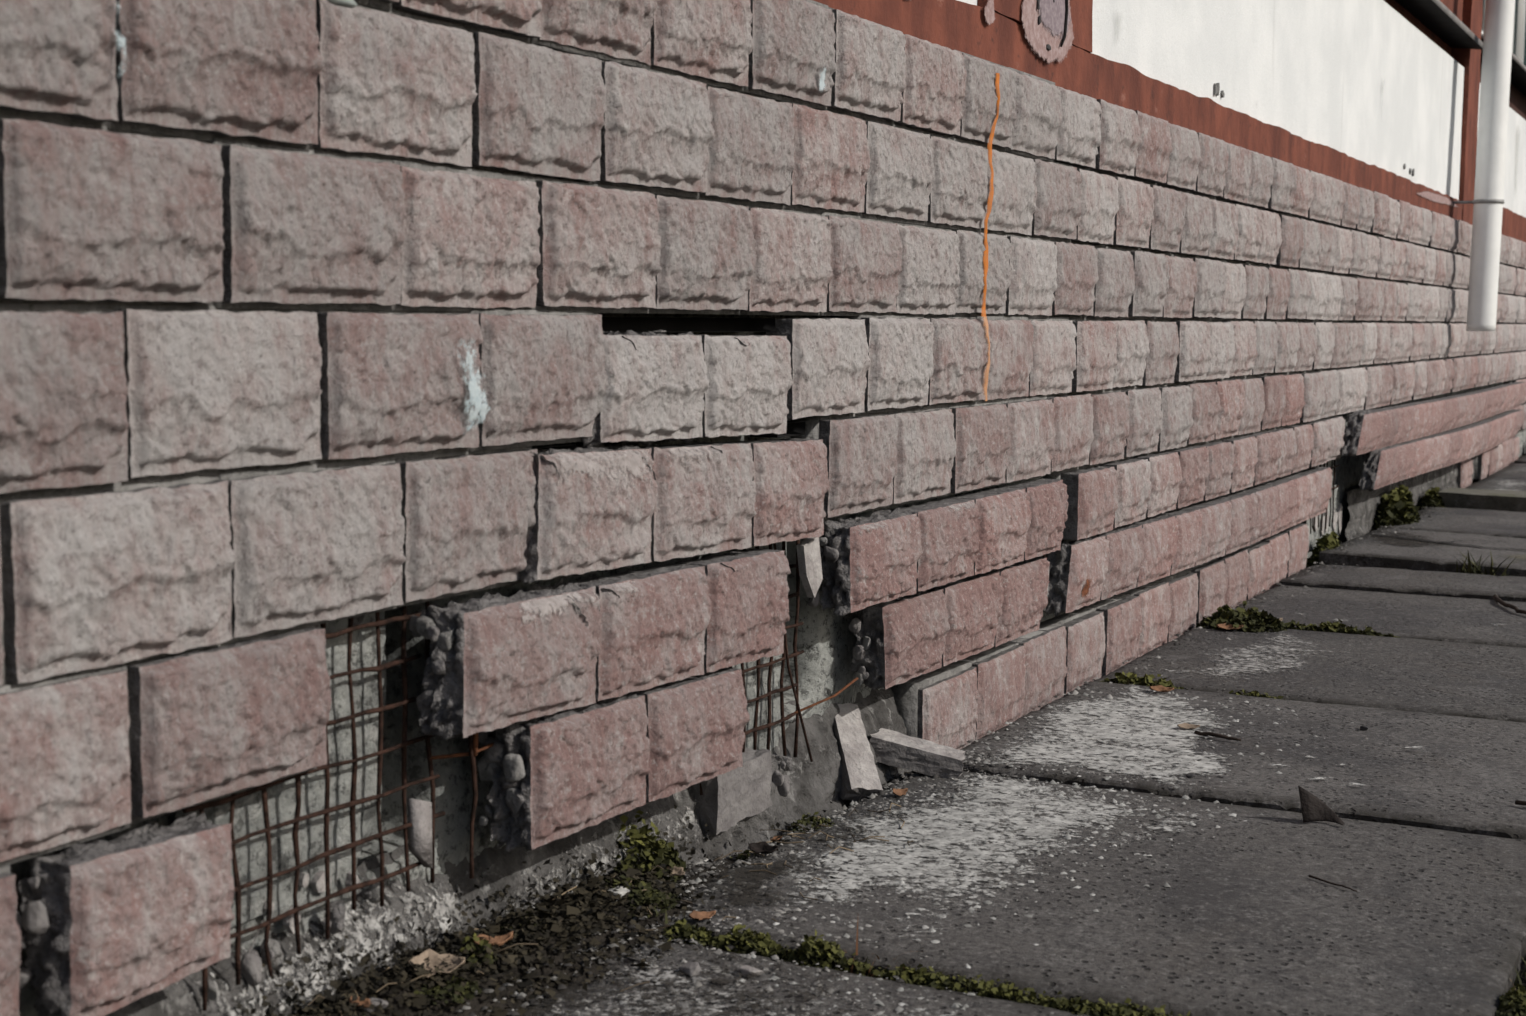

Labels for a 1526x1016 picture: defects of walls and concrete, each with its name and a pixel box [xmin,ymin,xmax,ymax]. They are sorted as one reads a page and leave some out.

corrosion [981,73,1000,401]
spalling [15,860,49,991]
spalling [176,601,525,1011]
spalling [727,537,873,797]